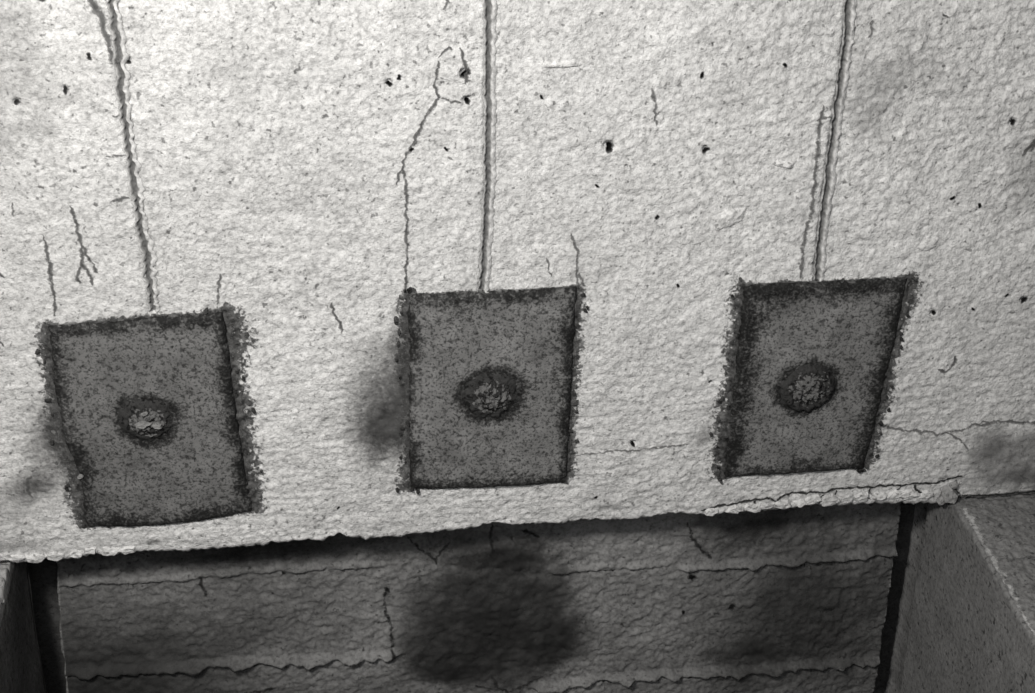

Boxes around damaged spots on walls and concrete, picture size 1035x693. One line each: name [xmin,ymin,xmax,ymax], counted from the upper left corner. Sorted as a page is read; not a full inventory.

crack [87,0,160,312]
crack [396,0,498,293]
crack [799,0,875,281]
crack [687,475,1035,558]
crack [885,419,1035,450]